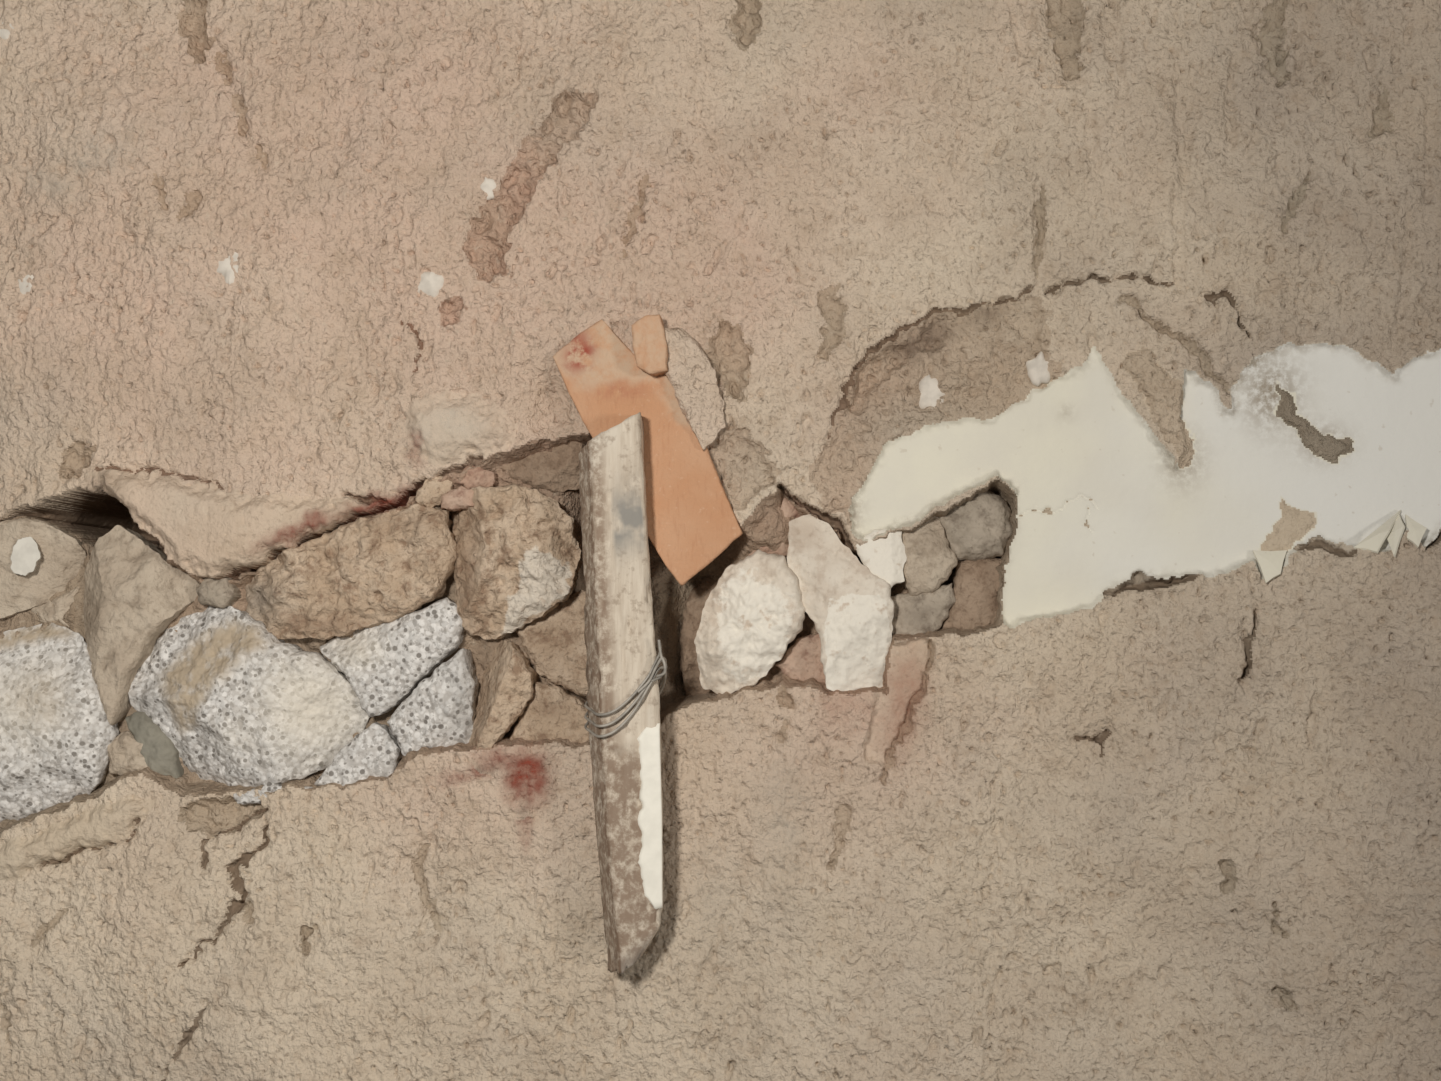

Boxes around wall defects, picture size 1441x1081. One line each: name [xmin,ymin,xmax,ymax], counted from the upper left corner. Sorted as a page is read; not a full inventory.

spalling [1281,172,1311,235]
crack [828,272,1250,439]
peeling [809,186,1441,628]
spalling [57,441,96,480]
crack [0,433,592,643]
crack [648,479,1093,786]
spalling [776,685,795,743]
flaking render [177,795,266,839]
crack [0,575,590,967]
spalling [826,804,852,872]
spalling [411,843,443,936]
crack [161,1008,206,1081]